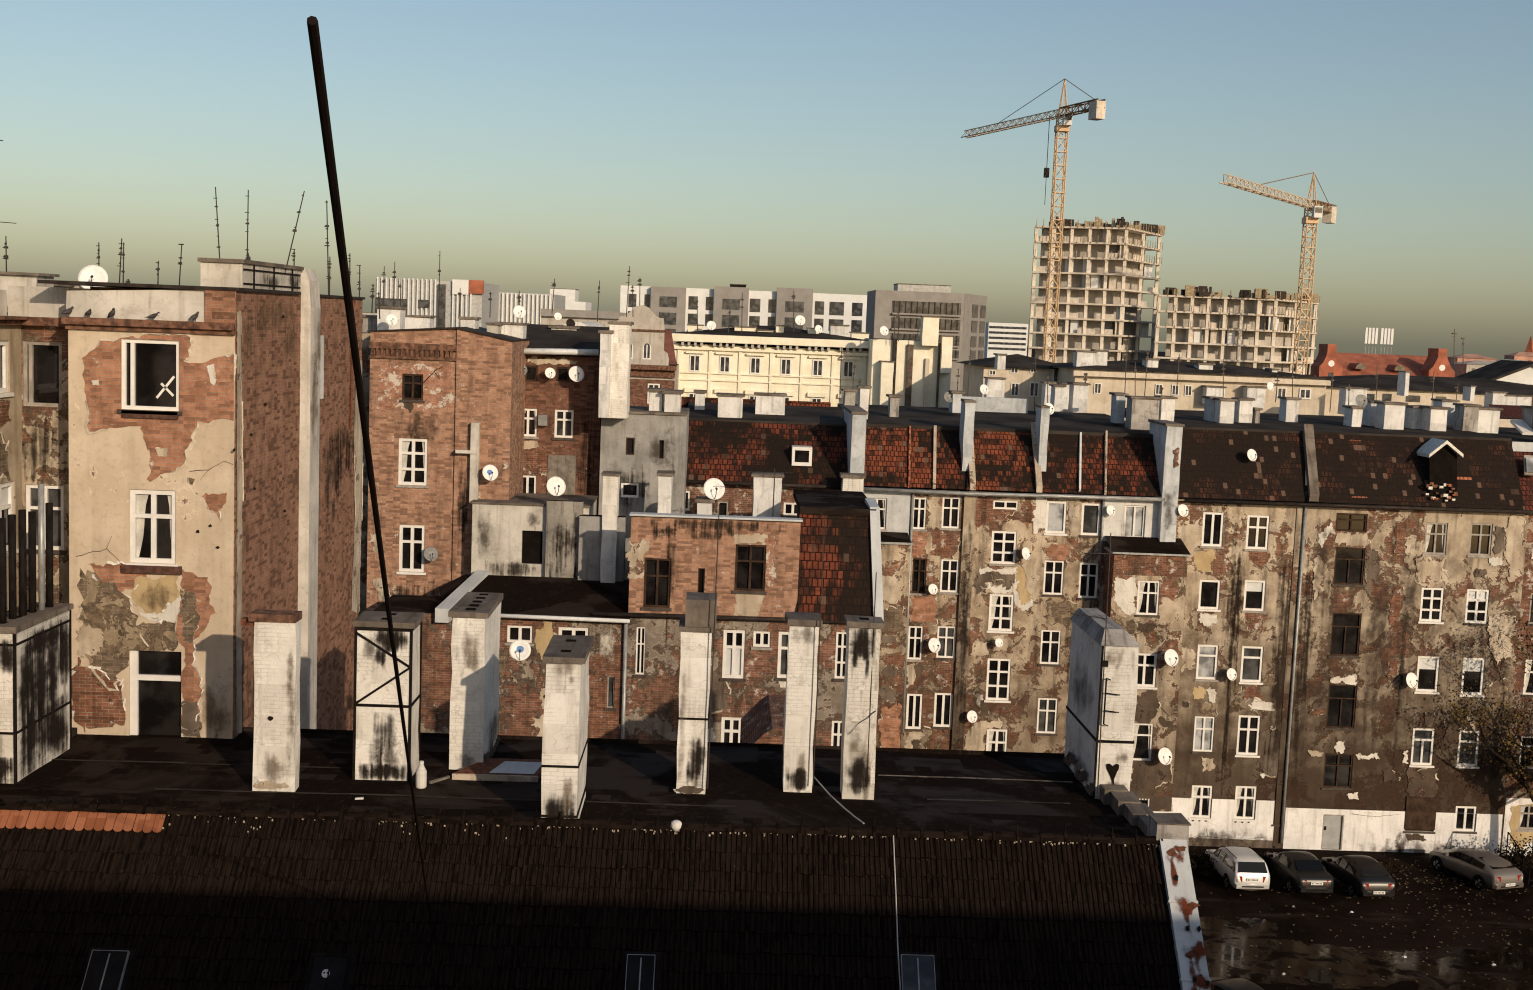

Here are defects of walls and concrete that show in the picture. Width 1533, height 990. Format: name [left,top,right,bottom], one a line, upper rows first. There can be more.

flaking render [82,332,256,533]
flaking render [975,496,1082,563]
peeling [972,566,1078,628]
peeling [72,561,149,731]
flaking render [162,569,215,738]
flaking render [1116,615,1192,670]
flaking render [878,660,955,749]
spalling [1135,689,1174,727]
water stain [360,746,405,780]
water stain [546,796,574,819]
spalling [1130,759,1173,812]
rust [1167,846,1213,990]